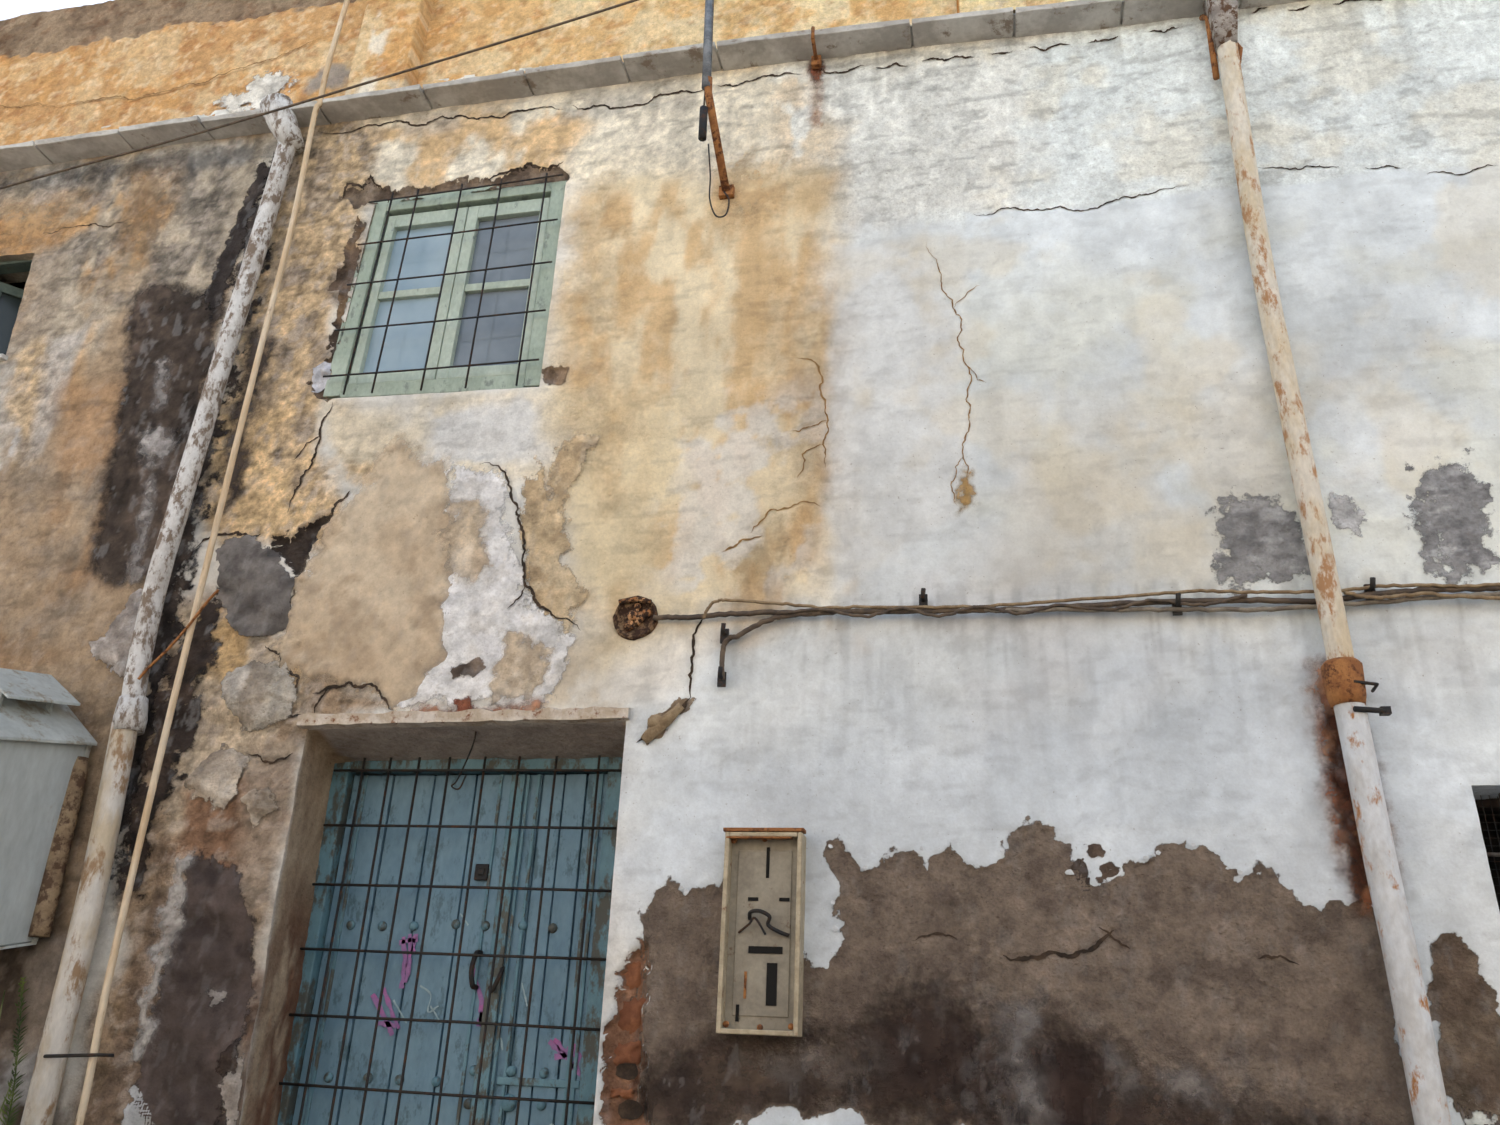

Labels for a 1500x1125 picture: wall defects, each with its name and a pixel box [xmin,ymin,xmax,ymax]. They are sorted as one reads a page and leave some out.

crack [318,27,1176,134]
water stain [89,153,275,587]
water stain [110,243,275,900]
crack [288,402,333,510]
peeling [397,465,576,709]
crack [482,462,580,630]
crack [926,247,983,511]
peeling [1404,448,1500,584]
rust [1311,659,1372,914]
water stain [134,850,257,1125]
flaking render [616,816,1414,1125]
flaking render [1426,932,1500,1125]